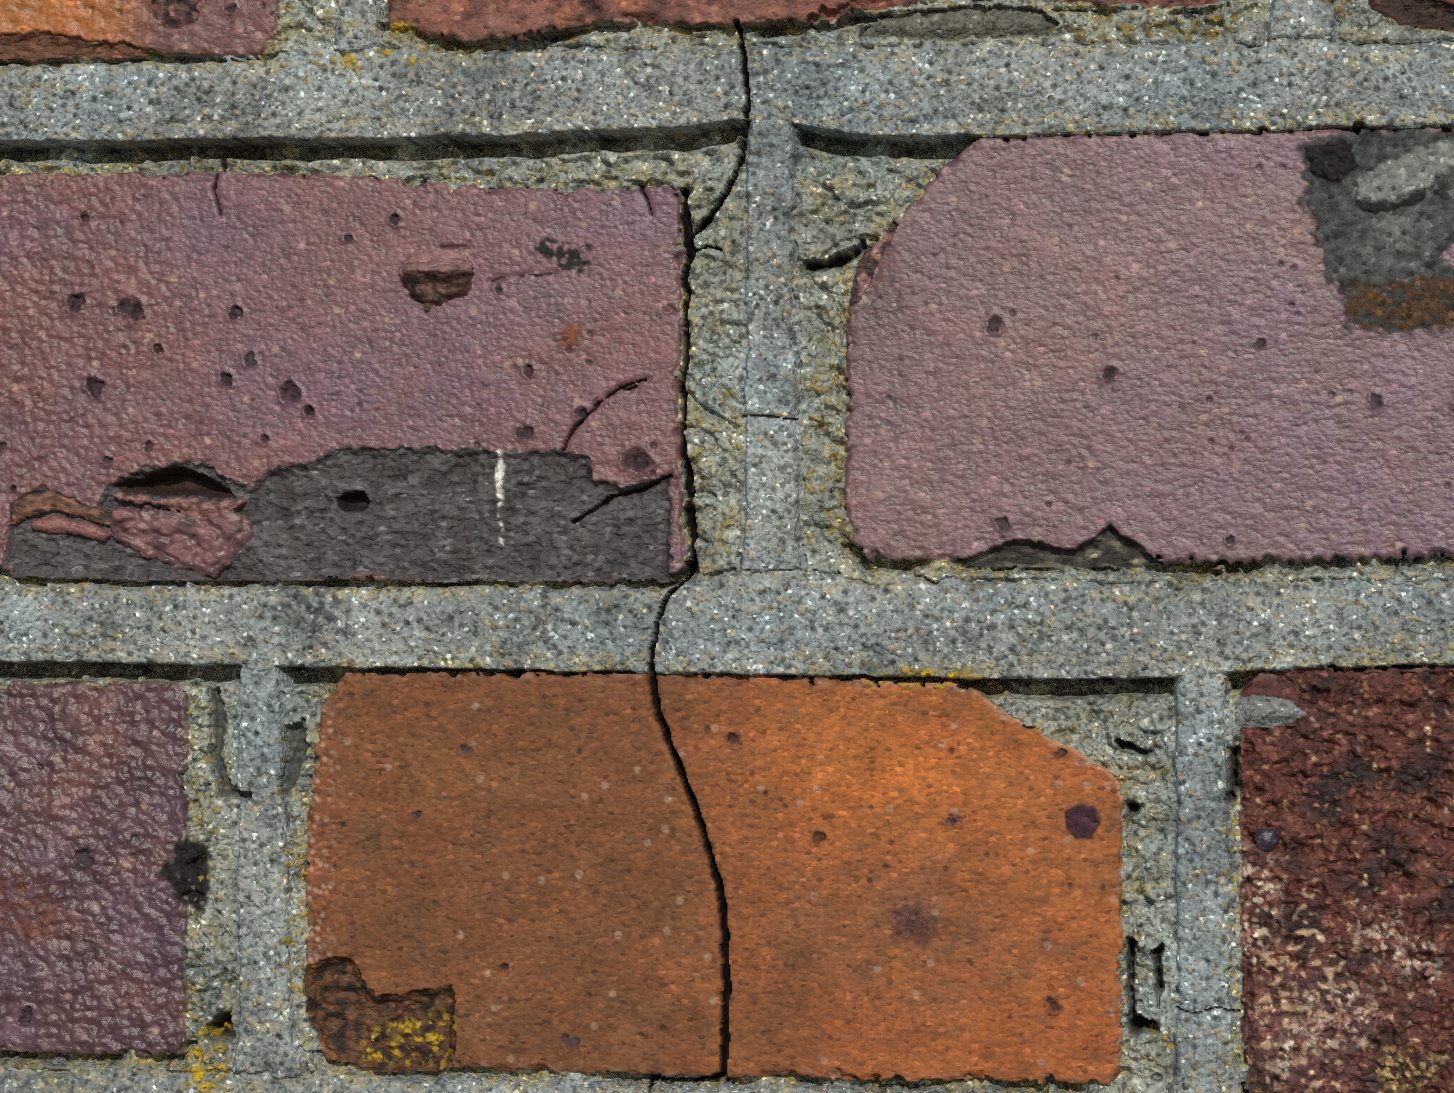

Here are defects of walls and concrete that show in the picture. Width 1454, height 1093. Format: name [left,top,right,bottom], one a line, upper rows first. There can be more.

spalling [3,427,678,585]
crack [562,22,751,1093]
spalling [955,517,1170,570]
spalling [304,957,457,1074]